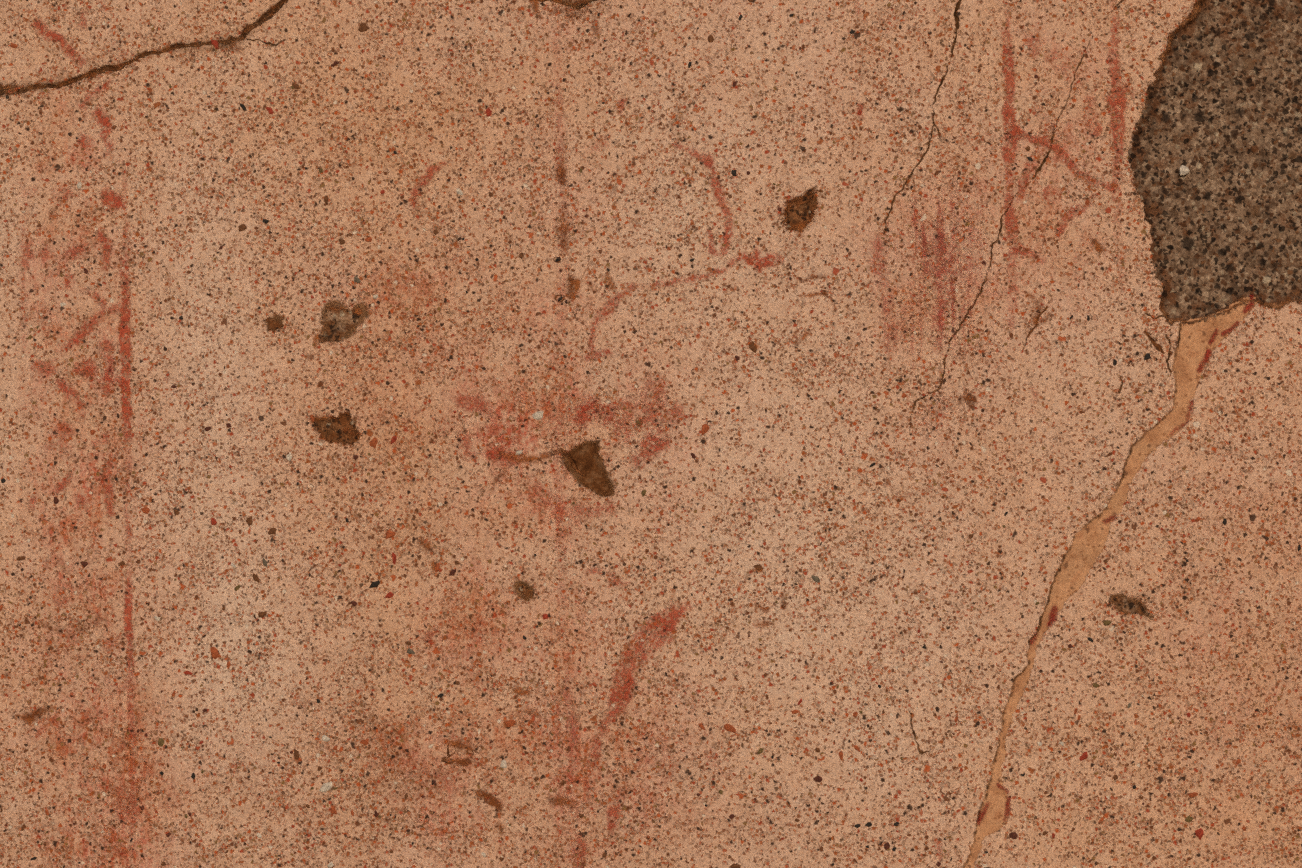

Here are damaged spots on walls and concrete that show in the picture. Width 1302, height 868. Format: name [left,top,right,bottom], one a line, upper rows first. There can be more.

crack [0,0,288,94]
crack [532,0,595,31]
crack [884,0,961,234]
crack [910,0,1123,427]
flaking render [1128,0,1302,326]
crack [963,294,1257,868]